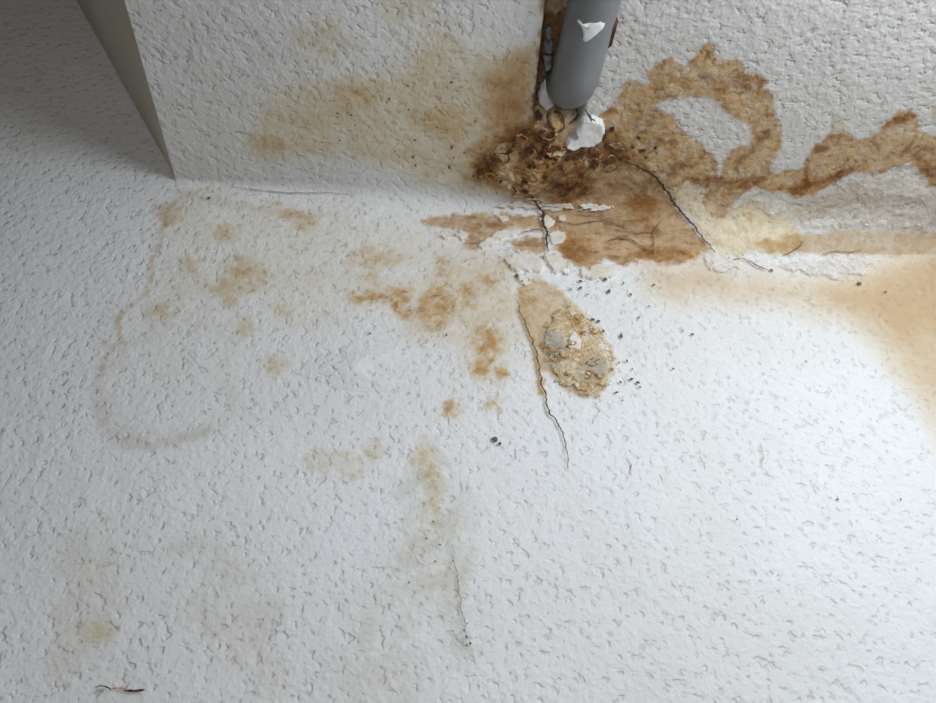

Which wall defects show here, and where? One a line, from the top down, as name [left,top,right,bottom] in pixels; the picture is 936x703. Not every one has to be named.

rust [448,12,657,205]
crack [521,146,715,256]
leakage [674,176,797,255]
crack [518,303,569,469]